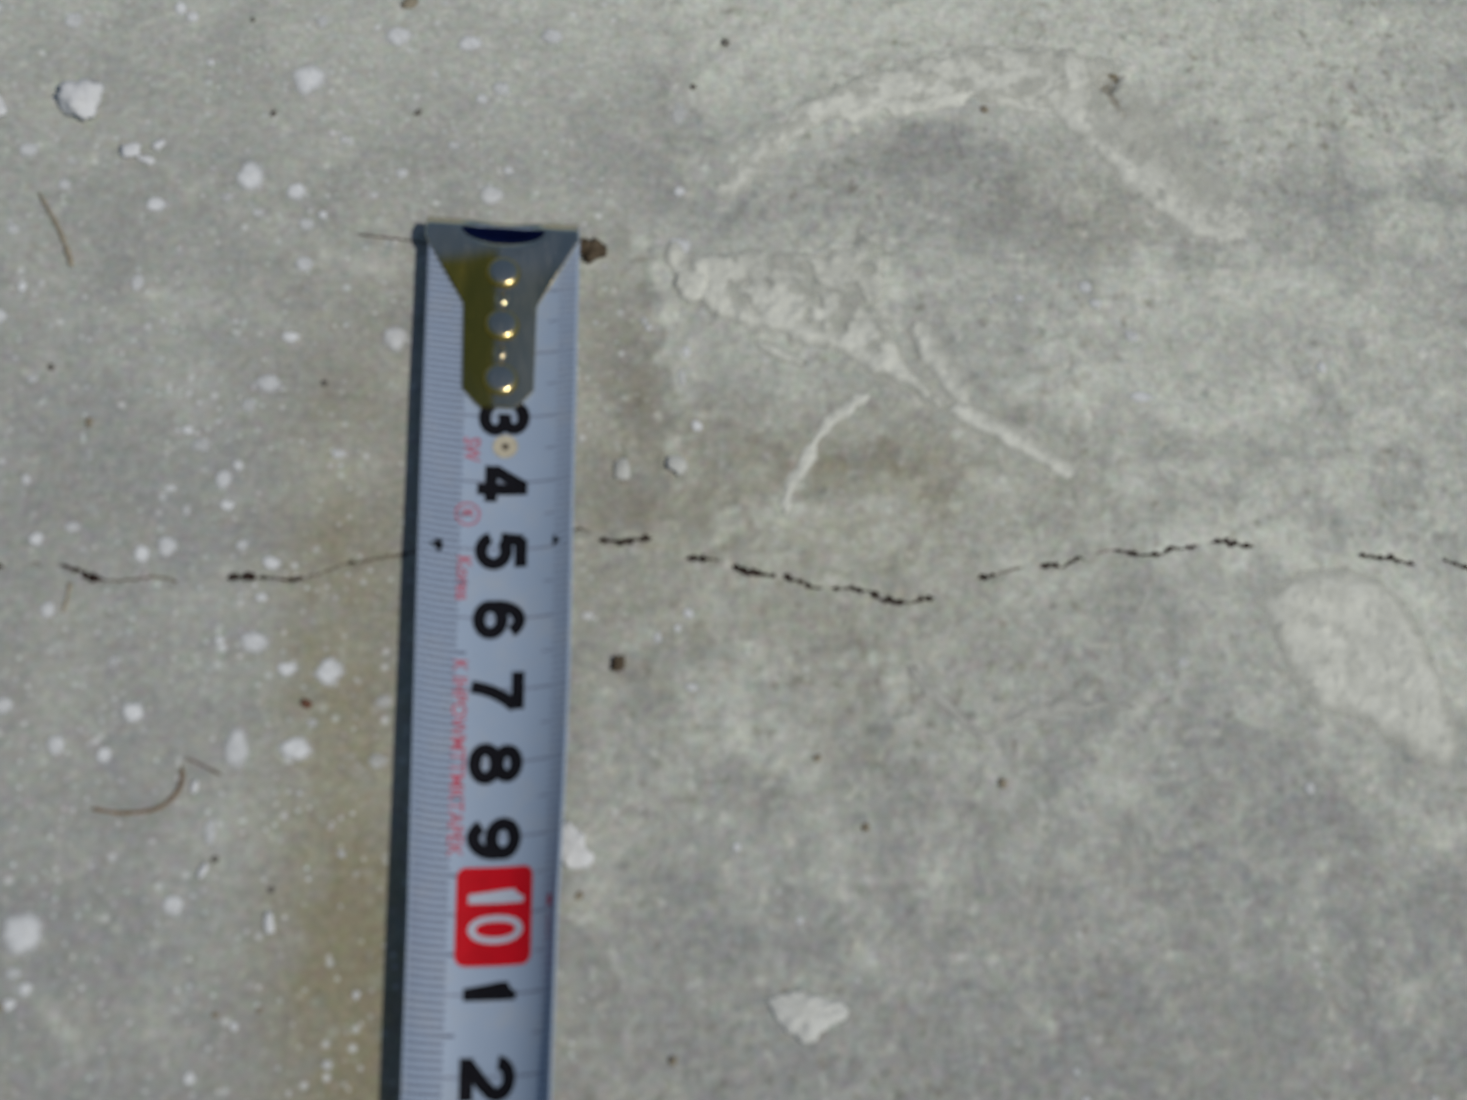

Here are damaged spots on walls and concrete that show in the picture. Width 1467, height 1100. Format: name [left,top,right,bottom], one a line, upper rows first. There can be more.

crack [573,527,652,546]
crack [0,561,178,584]
crack [227,550,417,582]
crack [686,554,934,606]
crack [978,537,1254,580]
crack [1358,552,1467,569]